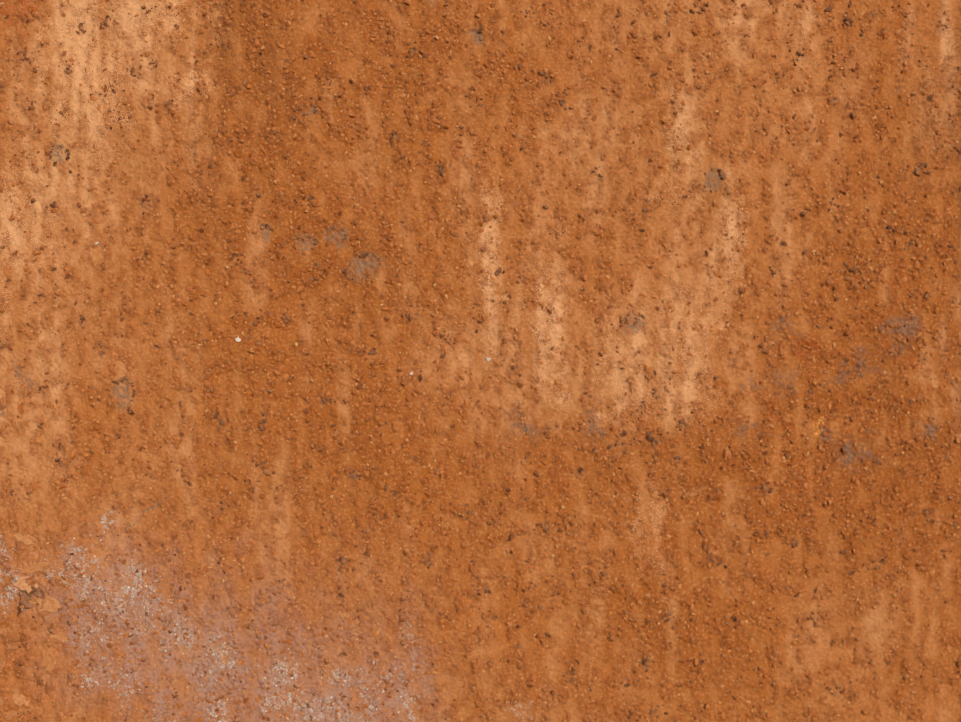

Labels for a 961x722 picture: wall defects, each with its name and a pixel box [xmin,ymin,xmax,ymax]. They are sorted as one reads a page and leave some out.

rust [608,412,694,454]
damp [44,511,242,722]
damp [248,620,421,722]